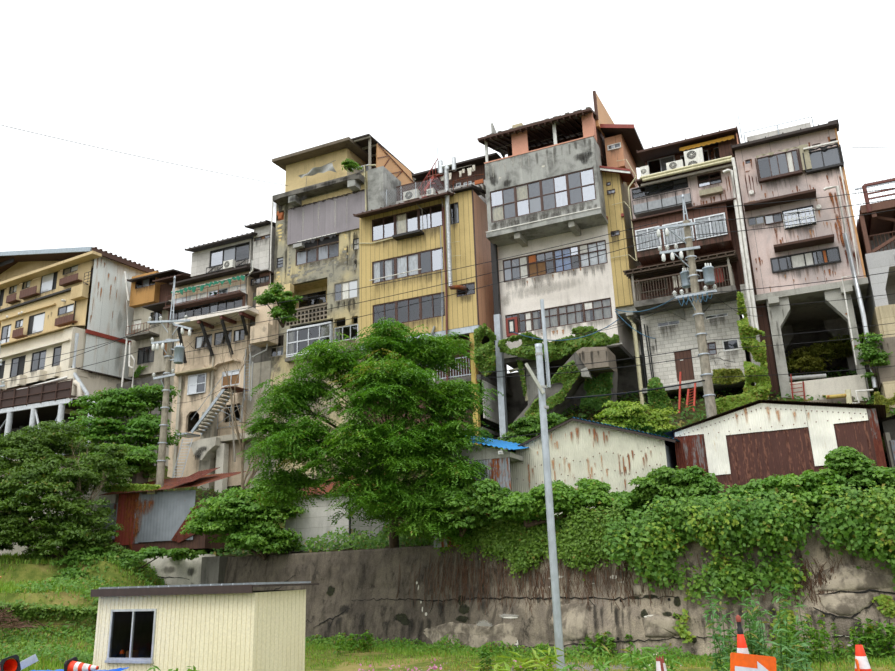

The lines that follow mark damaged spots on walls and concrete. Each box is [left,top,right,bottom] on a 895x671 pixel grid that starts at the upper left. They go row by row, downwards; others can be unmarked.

rust [792,175,863,270]
rust [550,428,610,448]
rust [618,451,651,488]
rust [171,506,198,543]
crack [306,596,678,627]
crack [813,589,895,638]
crack [510,635,731,648]